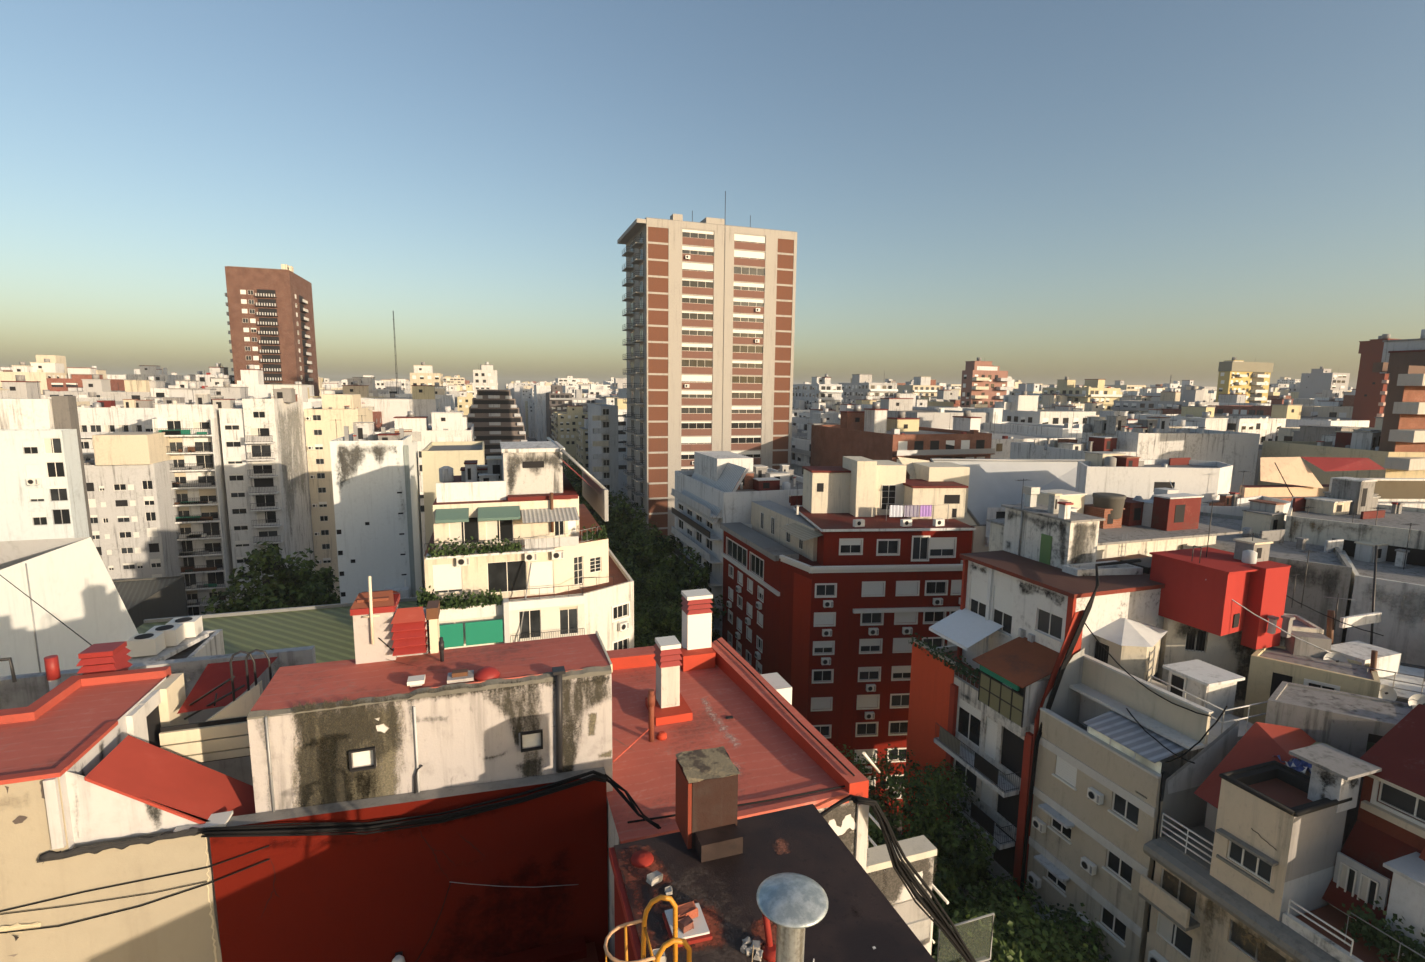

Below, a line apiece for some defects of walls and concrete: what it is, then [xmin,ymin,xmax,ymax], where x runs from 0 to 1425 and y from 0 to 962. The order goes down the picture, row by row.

water stain [338,446,395,483]
water stain [295,675,608,807]
peeling [828,814,856,836]
rust [618,846,725,962]
peeling [0,922,41,957]